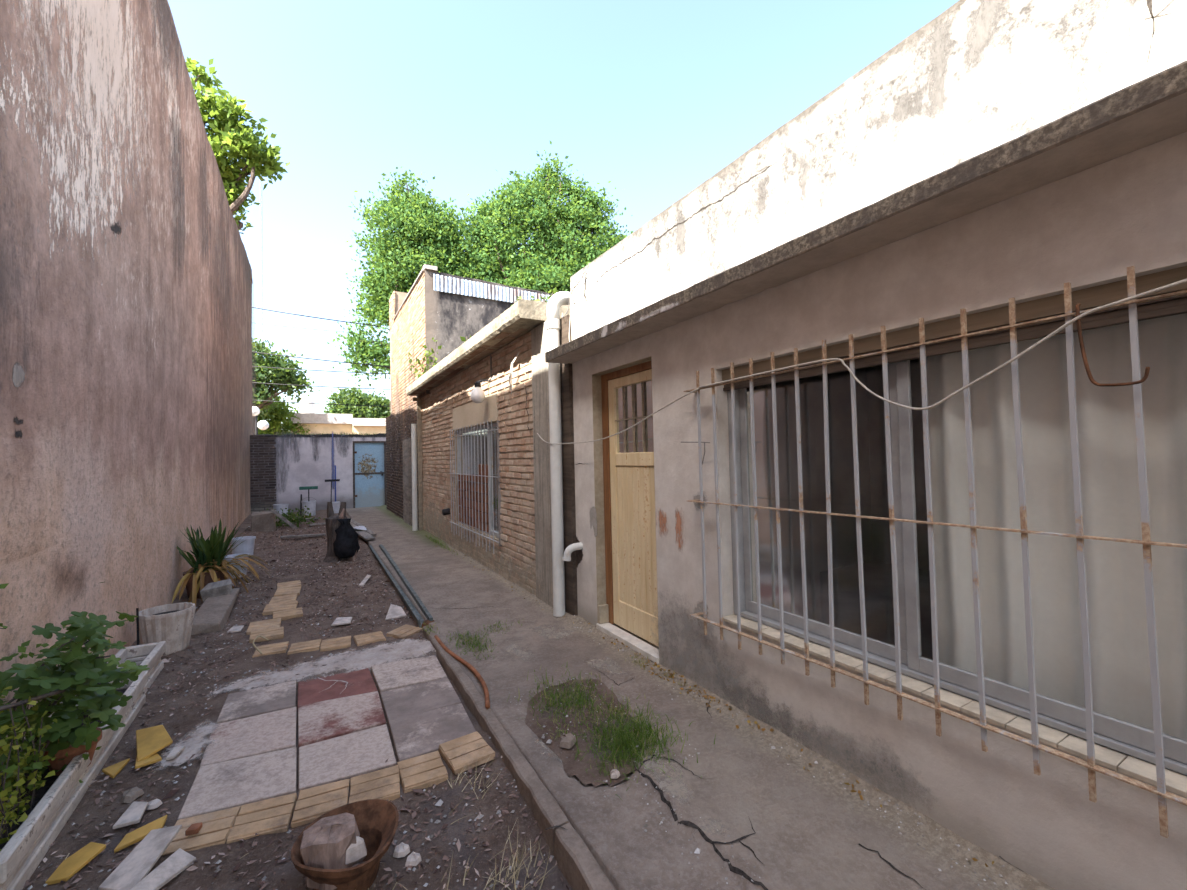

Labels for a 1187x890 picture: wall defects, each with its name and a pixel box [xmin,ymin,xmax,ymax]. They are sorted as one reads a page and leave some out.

peeling [0,0,147,257]
peeling [149,0,186,188]
water stain [870,22,951,127]
crack [1127,0,1180,74]
crack [575,123,830,305]
water stain [755,181,769,214]
crack [634,755,768,890]
crack [858,843,926,890]